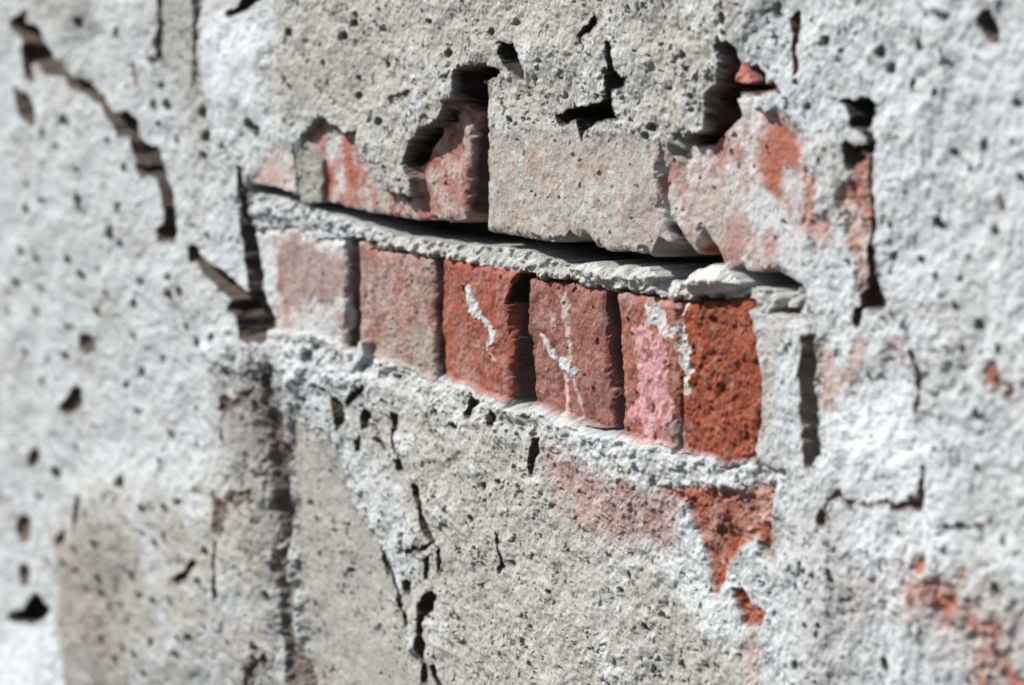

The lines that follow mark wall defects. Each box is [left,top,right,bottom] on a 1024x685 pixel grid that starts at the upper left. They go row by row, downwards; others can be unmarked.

crack [9,0,318,685]
crack [330,385,443,635]
spalling [245,28,887,685]
crack [815,464,993,534]